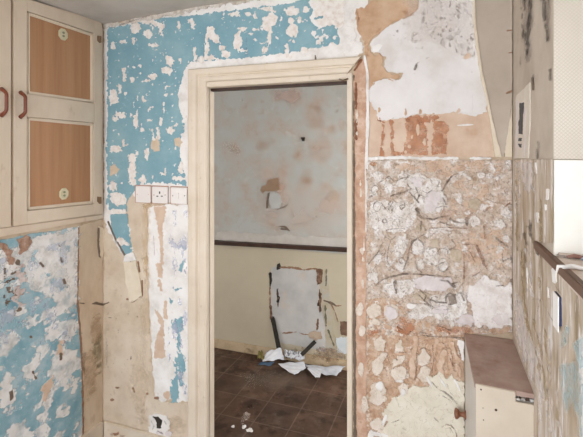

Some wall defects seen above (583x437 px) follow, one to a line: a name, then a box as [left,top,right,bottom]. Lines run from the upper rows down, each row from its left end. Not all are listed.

water stain [82,317,101,395]
peeling [0,0,418,437]
spalling [353,58,495,437]
crack [369,173,513,310]